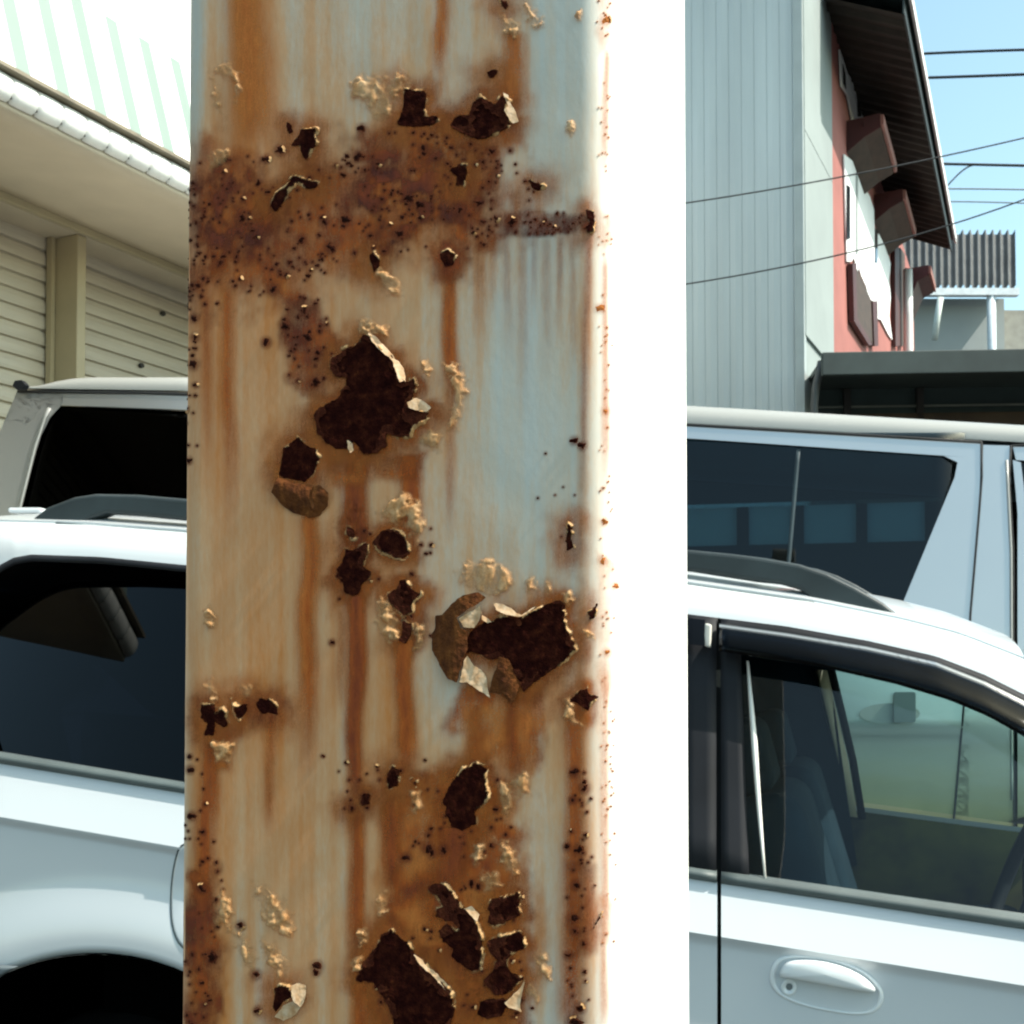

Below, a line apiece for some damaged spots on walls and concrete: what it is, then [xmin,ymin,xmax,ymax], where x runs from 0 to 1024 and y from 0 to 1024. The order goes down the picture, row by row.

rust [188,128,580,461]
peeling [187,70,611,369]
peeling [270,295,442,518]
rust [183,722,243,1024]
peeling [252,962,322,1021]
rust [341,593,367,788]
rust [394,637,416,762]
peeling [338,757,513,861]
peeling [350,880,536,1024]
rust [348,679,545,1024]
peeling [326,514,610,703]
rust [563,714,593,1018]